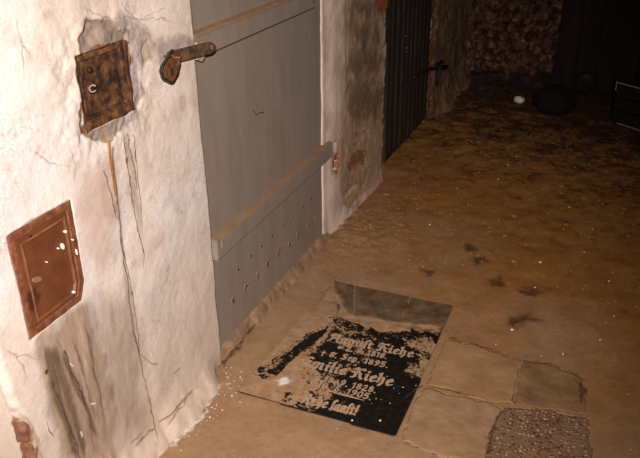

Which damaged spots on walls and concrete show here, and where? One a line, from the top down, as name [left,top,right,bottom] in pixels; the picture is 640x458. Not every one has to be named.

flaking render [77,17,155,143]
water stain [340,0,384,196]
corrosion [108,141,117,196]
peeling [330,150,366,175]
water stain [39,305,115,458]
spalling [11,416,42,458]
crack [132,391,192,446]